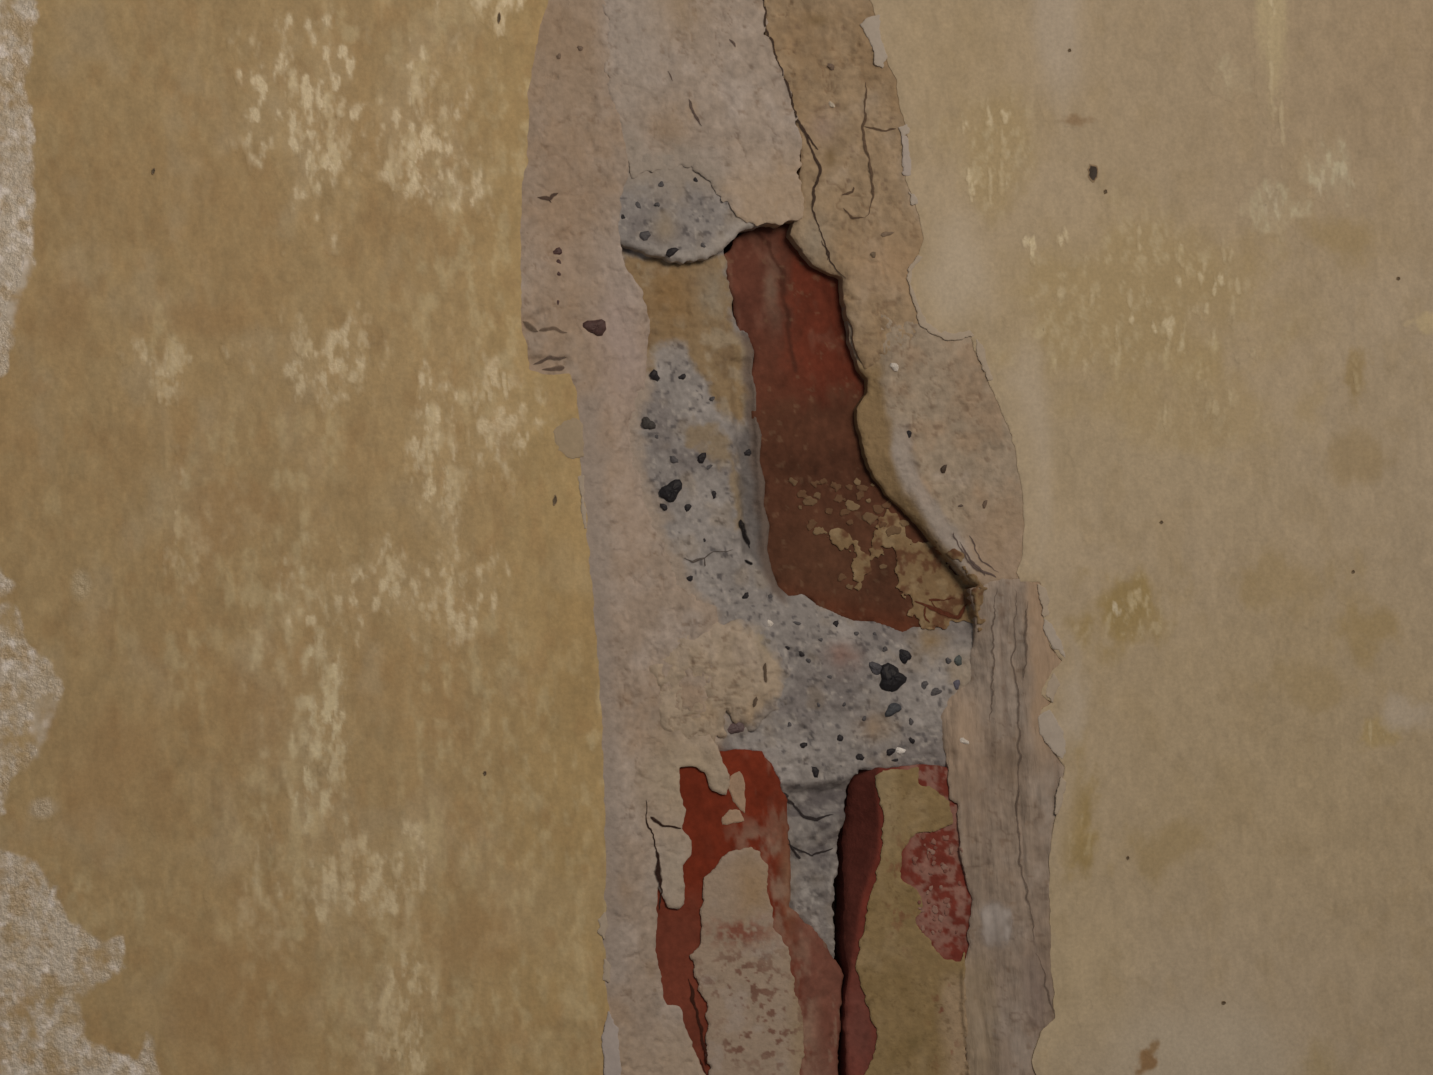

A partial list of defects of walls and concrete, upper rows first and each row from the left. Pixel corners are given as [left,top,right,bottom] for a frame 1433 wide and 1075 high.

crack [669,73,702,126]
crack [729,0,896,276]
flaking render [520,0,791,1075]
flaking render [763,0,1066,1075]
crack [646,801,681,910]
crack [688,979,708,1075]
corrosion [1129,1037,1163,1075]